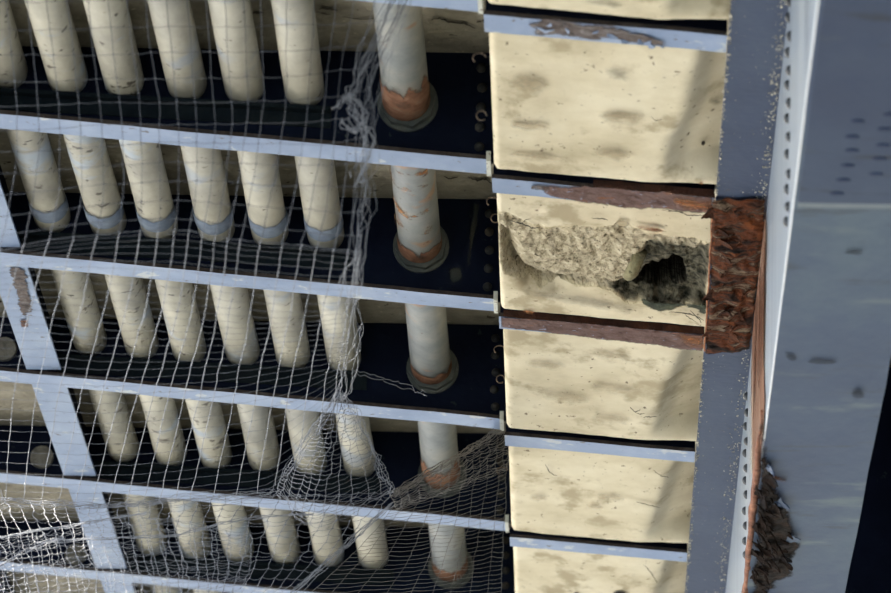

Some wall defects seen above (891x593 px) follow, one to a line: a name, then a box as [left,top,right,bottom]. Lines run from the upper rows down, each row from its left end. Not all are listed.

peeling [529,19,664,49]
corrosion [379,75,431,121]
spalling [497,209,710,309]
corrosion [501,179,801,593]